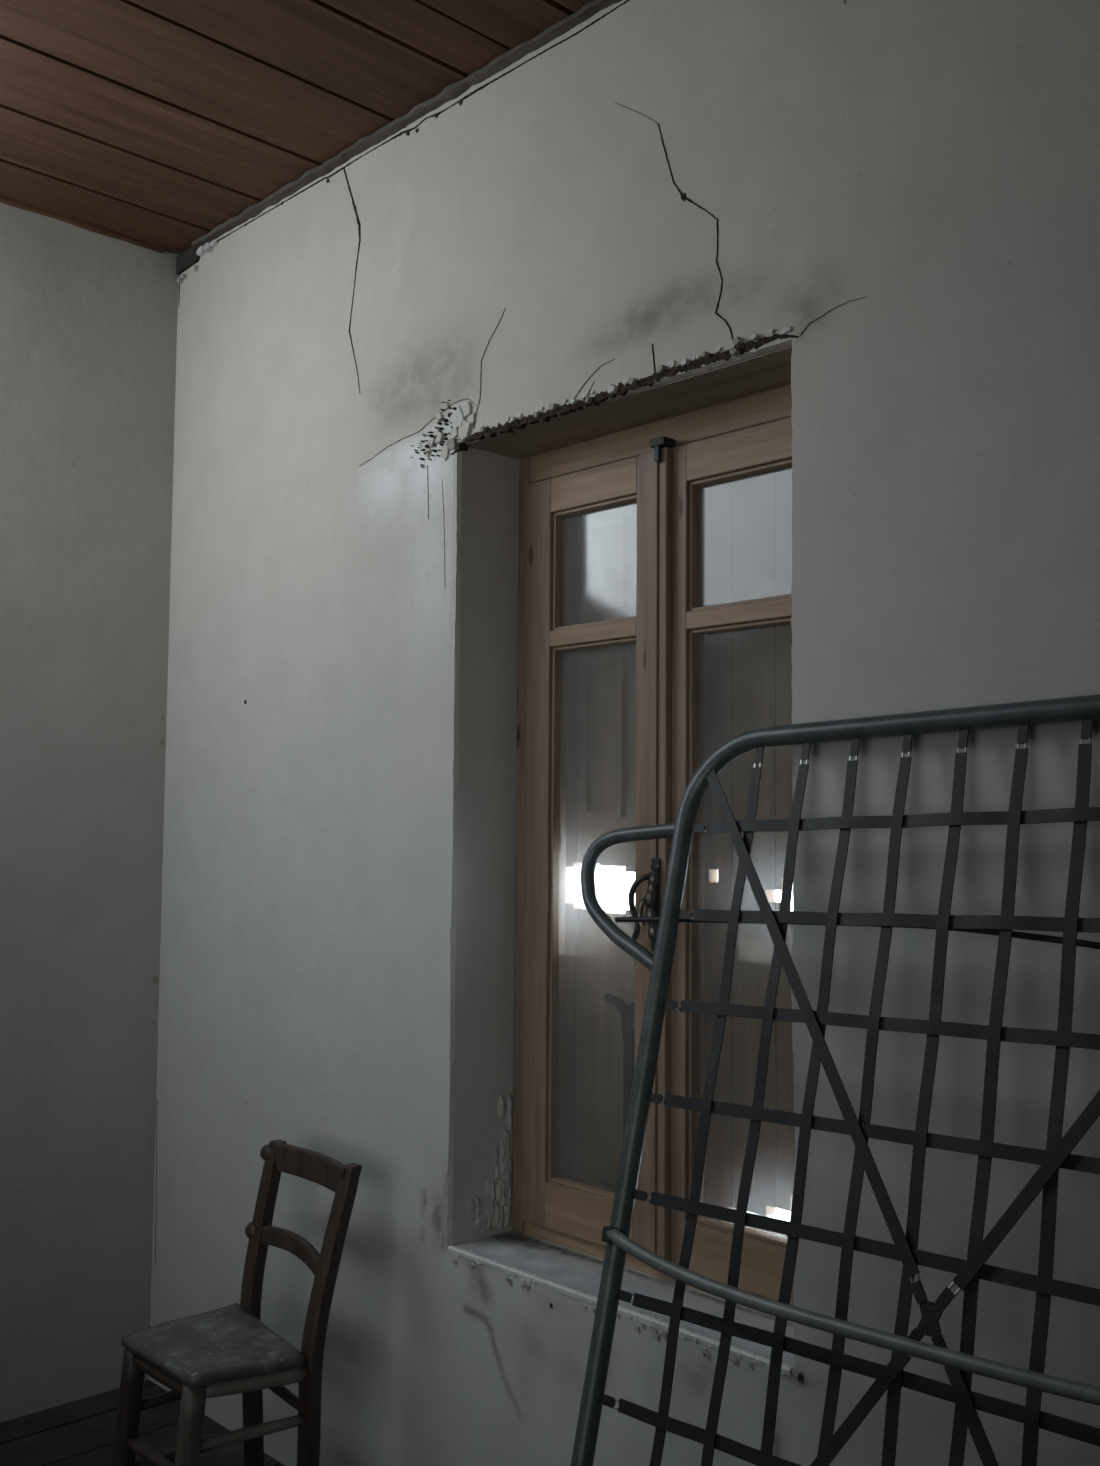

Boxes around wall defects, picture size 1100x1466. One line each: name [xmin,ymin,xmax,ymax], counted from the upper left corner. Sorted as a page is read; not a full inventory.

crack [616,103,736,347]
crack [800,297,865,336]
spalling [410,326,799,468]
peeling [468,1094,513,1233]